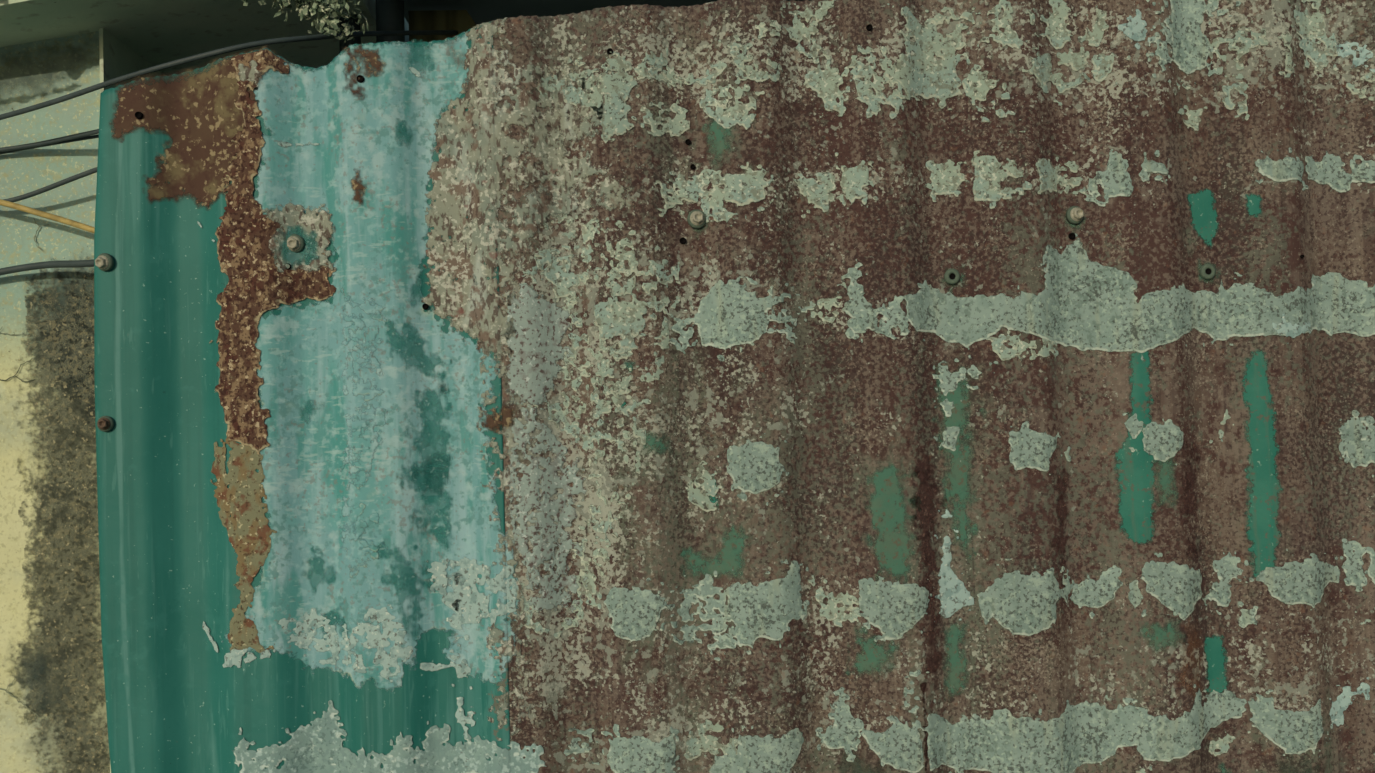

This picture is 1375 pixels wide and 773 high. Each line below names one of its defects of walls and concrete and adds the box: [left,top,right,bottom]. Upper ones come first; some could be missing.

rust [110,54,259,209]
rust [482,405,520,432]
peeling [223,0,1375,735]
water stain [8,270,110,773]
rust [1049,469,1069,587]
rust [1177,443,1201,523]
rust [906,437,947,771]
peeling [232,697,546,773]
peeling [563,670,1370,773]